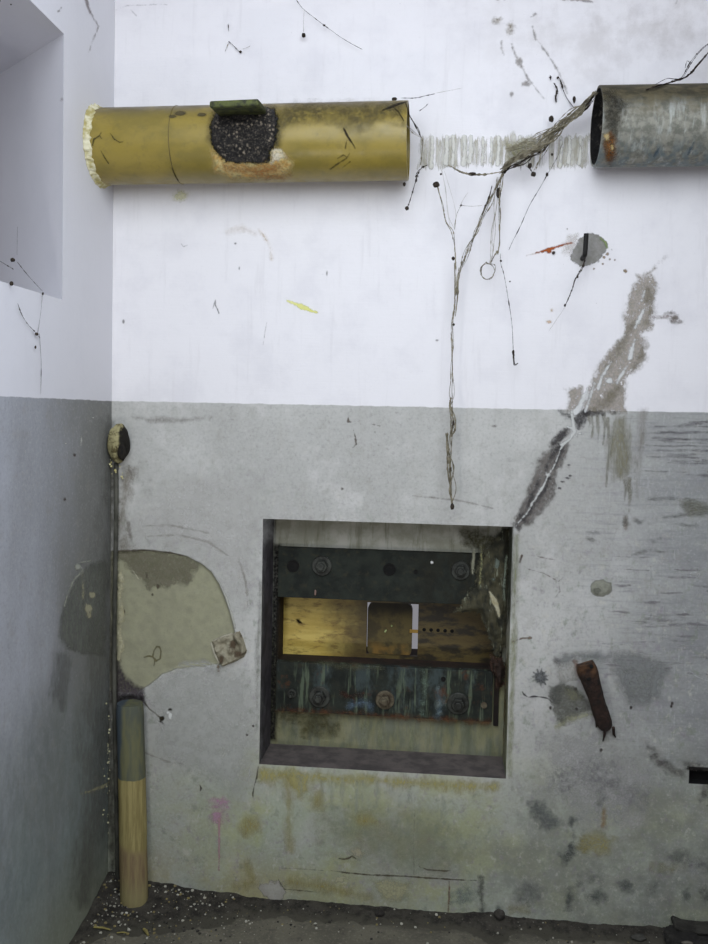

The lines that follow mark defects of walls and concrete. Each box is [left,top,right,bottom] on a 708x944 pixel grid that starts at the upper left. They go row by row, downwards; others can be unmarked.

water stain [568,268,677,497]
spalling [61,551,241,723]
water stain [260,770,496,805]